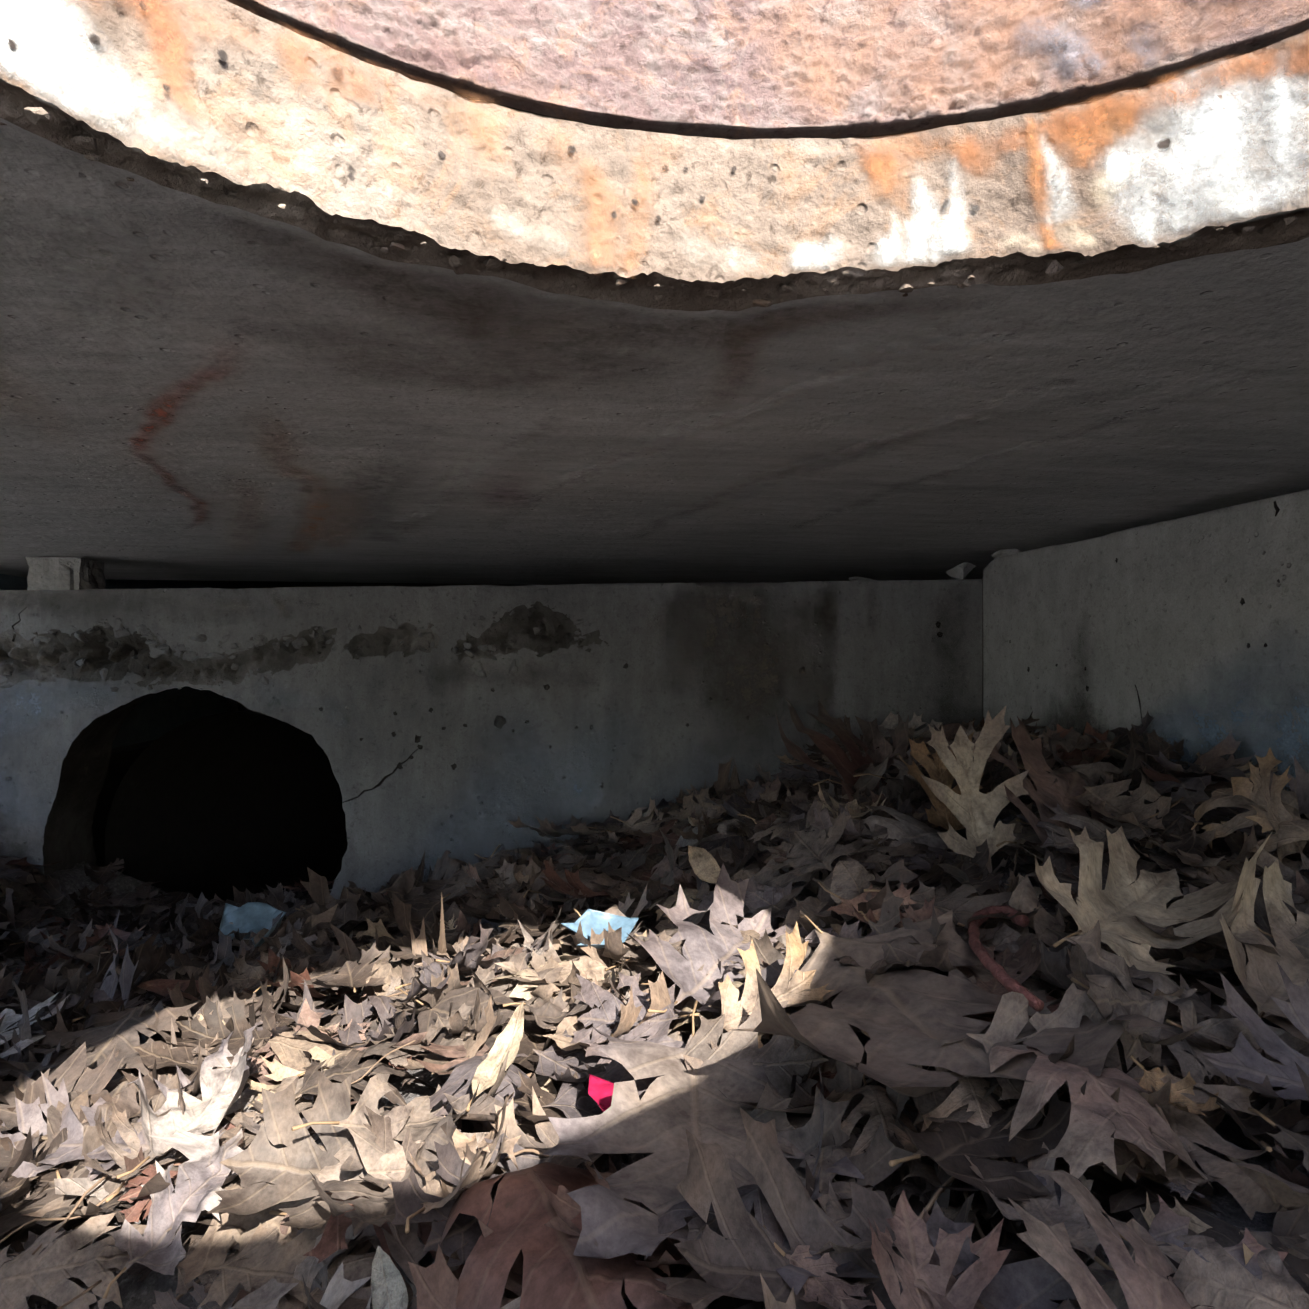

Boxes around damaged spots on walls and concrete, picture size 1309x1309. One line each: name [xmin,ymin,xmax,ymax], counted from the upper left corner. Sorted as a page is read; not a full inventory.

corrosion [1024,27,1103,74]
efflorescence [1044,155,1068,203]
corrosion [1005,100,1134,197]
efflorescence [1106,67,1307,240]
efflorescence [881,188,965,262]
spalling [0,601,610,691]
crack [343,746,422,803]